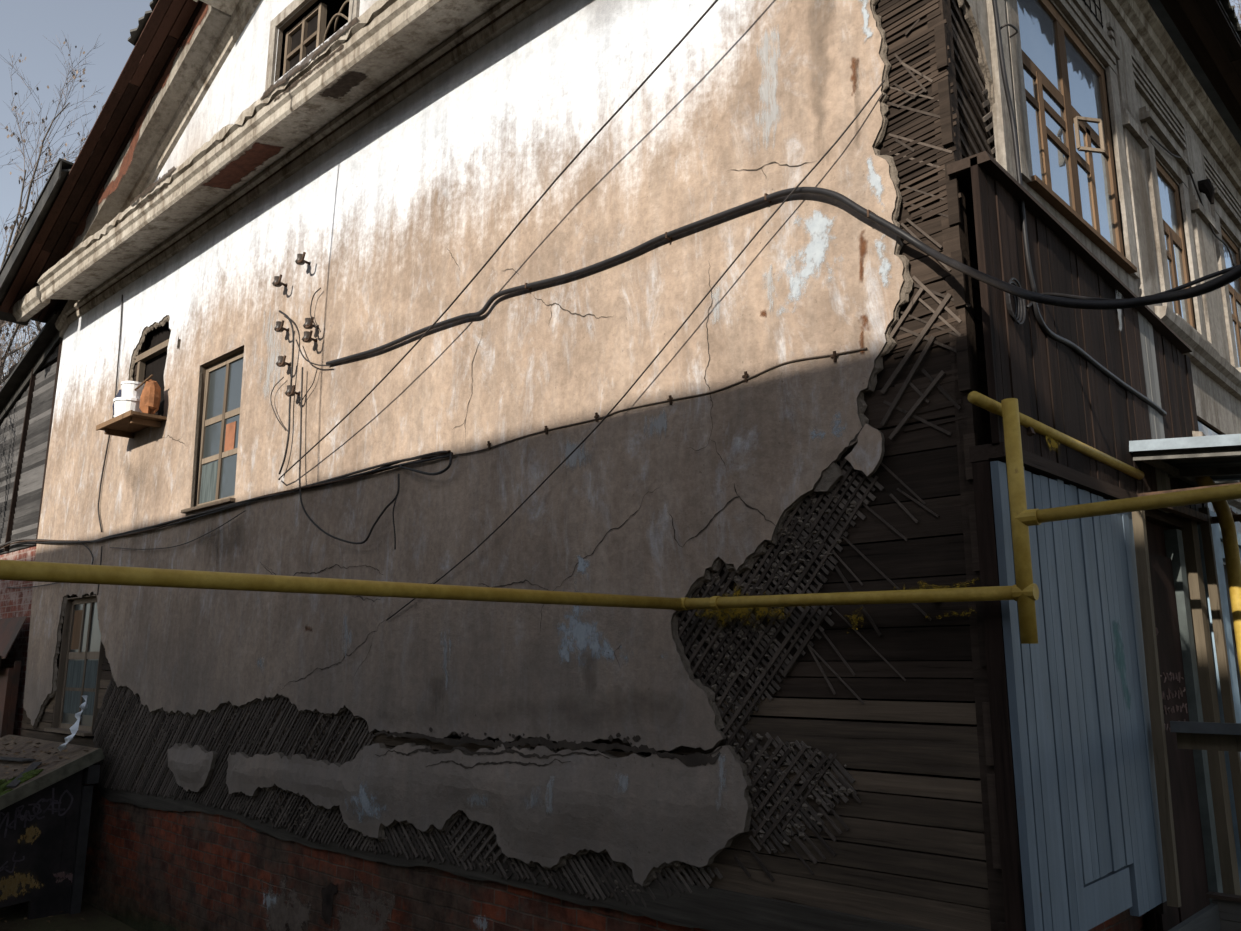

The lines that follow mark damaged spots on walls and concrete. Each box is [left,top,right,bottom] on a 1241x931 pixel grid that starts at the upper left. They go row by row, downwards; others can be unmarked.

peeling [274,44,344,101]
crack [728,160,817,176]
spalling [129,315,181,381]
crack [481,264,775,630]
spalling [672,0,996,882]
crack [261,564,390,690]
peeling [558,605,627,665]
spalling [92,663,723,907]